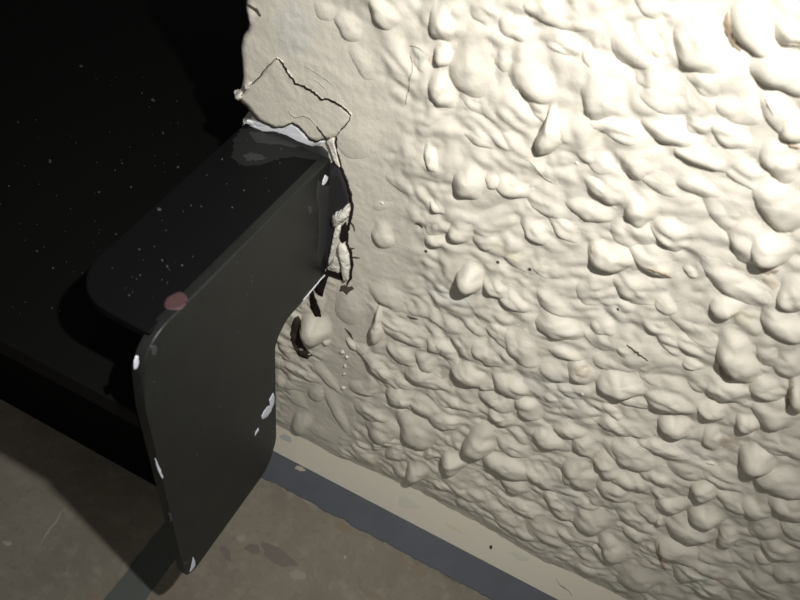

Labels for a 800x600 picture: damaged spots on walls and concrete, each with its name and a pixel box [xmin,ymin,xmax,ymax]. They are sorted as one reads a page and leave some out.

peeling [234,58,354,317]
crack [239,58,360,287]